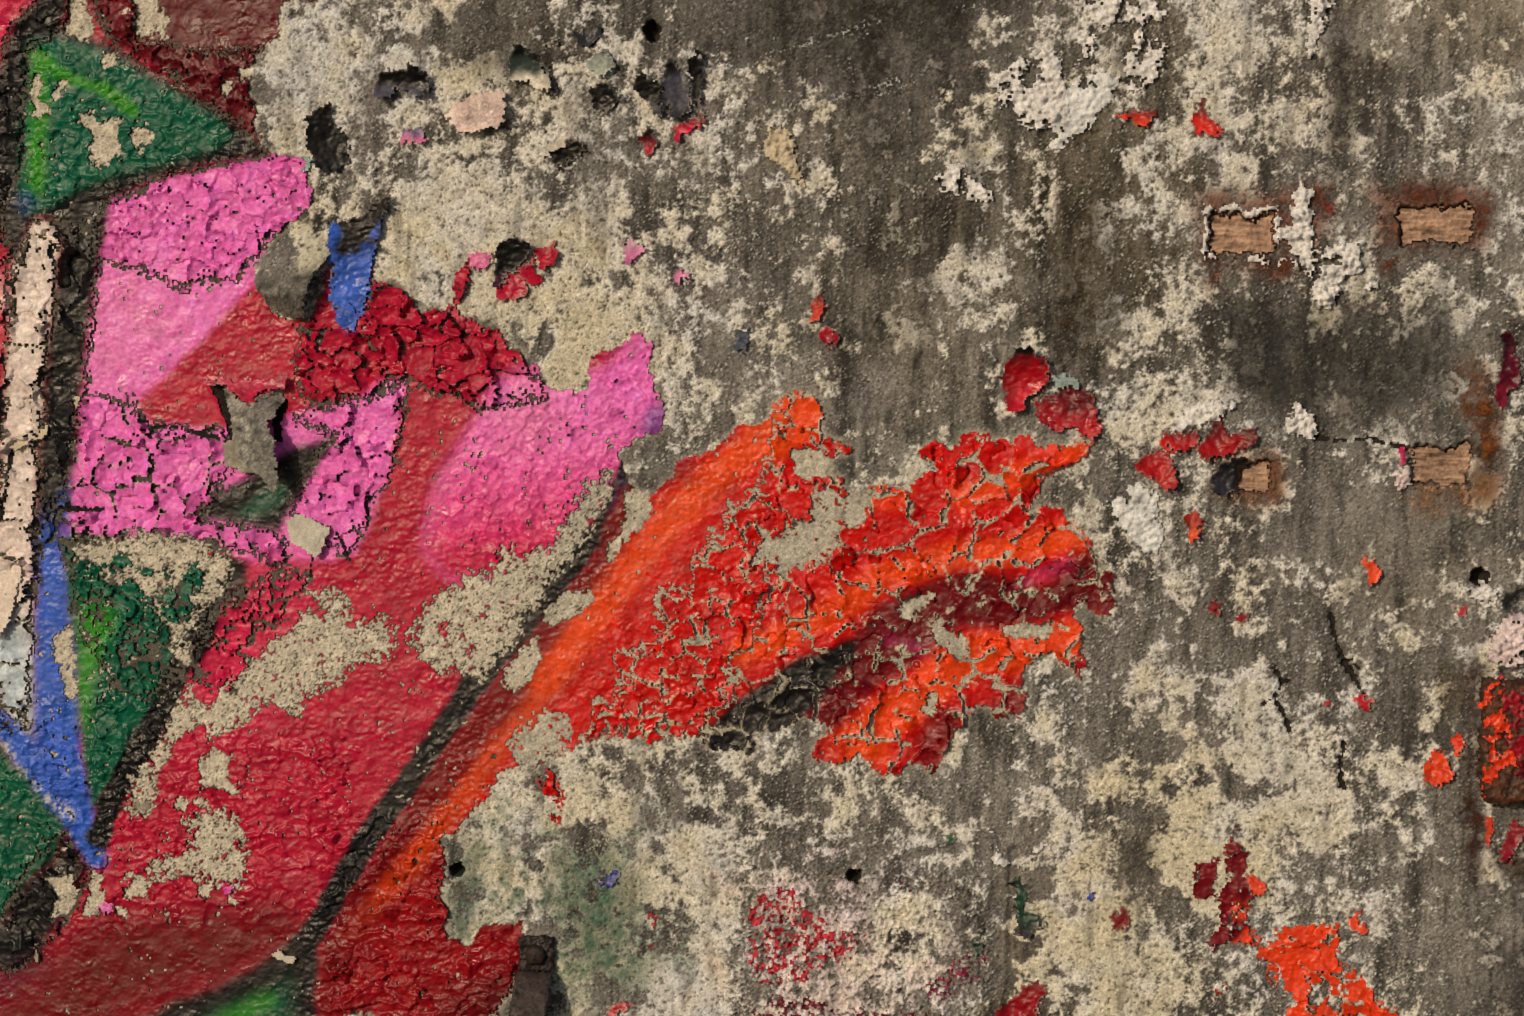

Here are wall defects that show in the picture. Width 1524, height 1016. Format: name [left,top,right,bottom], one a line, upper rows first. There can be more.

peeling [0,0,260,222]
peeling [373,62,434,100]
peeling [444,27,707,157]
crack [0,241,31,317]
spalling [1134,296,1458,498]
crack [0,450,15,522]
peeling [0,101,655,969]
peeling [509,345,1116,824]
crack [1261,665,1292,734]
crack [1328,612,1366,697]
crack [1337,740,1348,790]
peeling [1192,828,1398,1016]